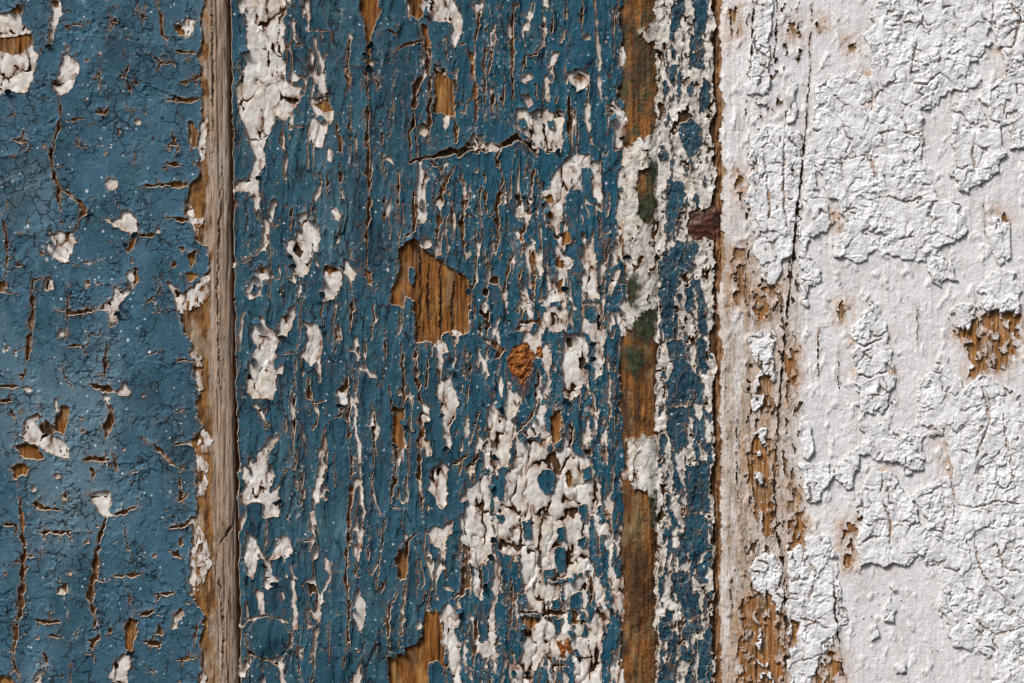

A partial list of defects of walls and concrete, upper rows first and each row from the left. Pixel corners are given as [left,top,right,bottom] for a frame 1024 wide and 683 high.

crack [0,200,41,417]
peeling [0,0,64,95]
crack [7,65,146,232]
peeling [233,0,334,299]
peeling [236,172,343,589]
crack [326,0,610,512]
rust [507,342,543,394]
peeling [385,52,713,683]
peeling [636,0,711,159]
crack [772,9,812,681]
peeling [729,0,1024,683]
crack [0,497,139,683]